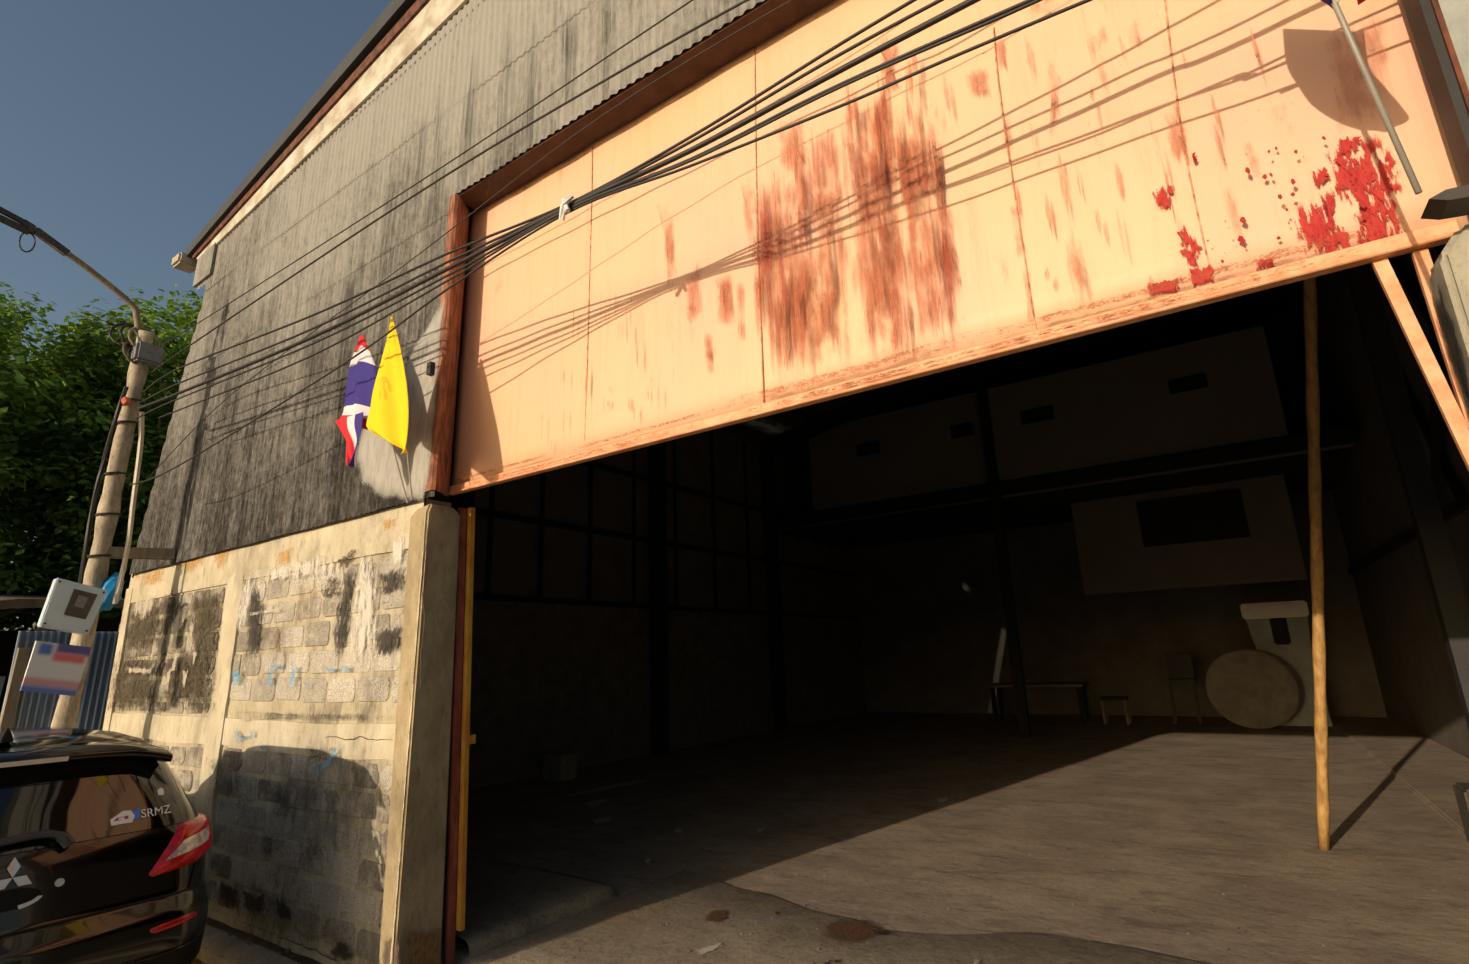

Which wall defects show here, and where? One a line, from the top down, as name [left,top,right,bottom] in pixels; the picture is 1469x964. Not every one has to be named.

rust [721,41,1376,412]
peeling [1152,185,1174,210]
peeling [1147,217,1246,295]
peeling [1268,136,1405,253]
leakage [107,538,404,712]
leakage [219,881,351,961]